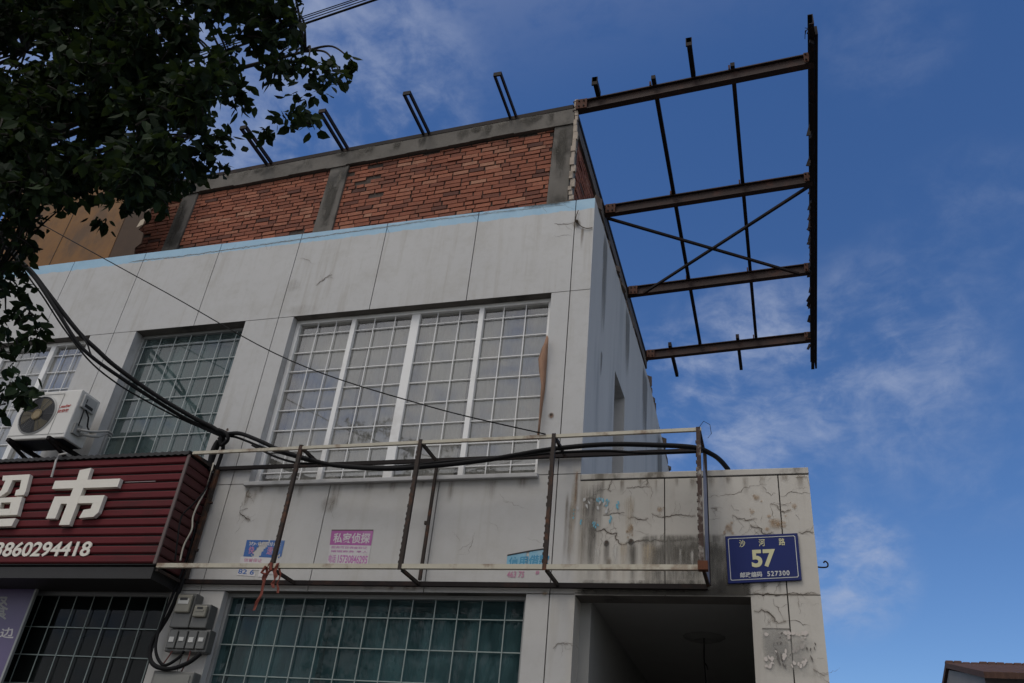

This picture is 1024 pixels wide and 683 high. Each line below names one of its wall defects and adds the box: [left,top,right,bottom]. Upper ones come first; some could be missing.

crack [585,473,814,546]
leakage [581,536,750,596]
crack [755,585,819,630]
peeling [764,631,808,669]